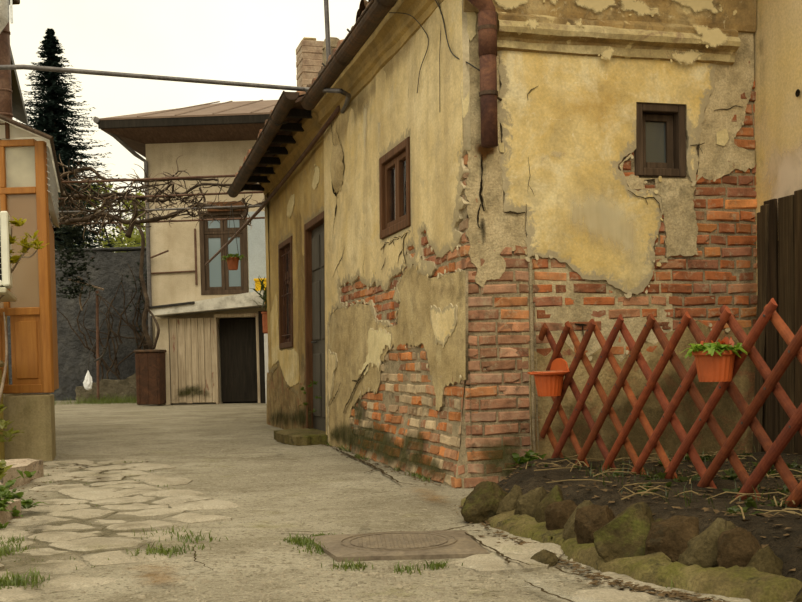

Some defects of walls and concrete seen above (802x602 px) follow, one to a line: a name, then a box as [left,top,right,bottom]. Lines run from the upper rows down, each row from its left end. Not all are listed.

peeling [495,0,528,9]
peeling [575,0,660,17]
peeling [672,0,722,13]
flaking render [327,12,757,488]